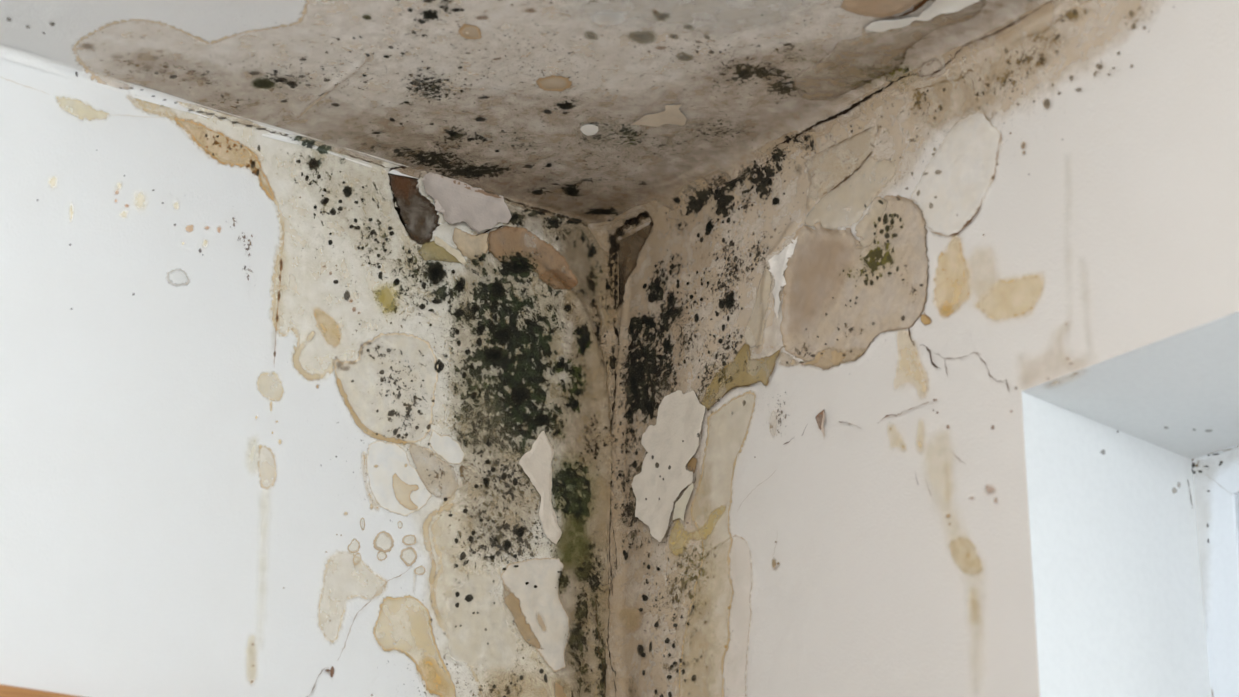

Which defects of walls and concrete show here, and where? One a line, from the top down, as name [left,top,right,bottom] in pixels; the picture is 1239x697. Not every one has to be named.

crack [773,0,1053,149]
water stain [825,0,1090,185]
spalling [388,165,578,290]
water stain [839,192,905,290]
water stain [73,0,873,697]
spalling [631,195,929,542]
crack [844,402,929,428]
crack [908,297,1017,391]
peeling [493,431,570,672]
crack [307,568,410,697]